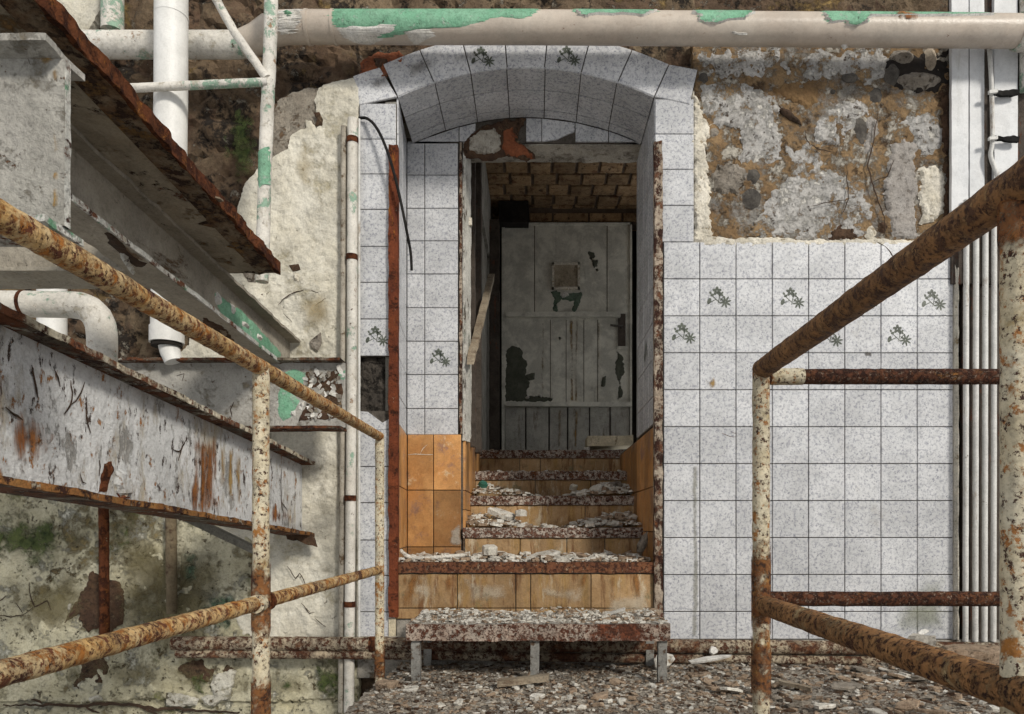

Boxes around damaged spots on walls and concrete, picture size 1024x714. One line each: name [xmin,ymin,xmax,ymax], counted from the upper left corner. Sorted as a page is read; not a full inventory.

rust [0,0,281,275]
flaking render [690,10,949,247]
peeling [551,290,582,312]
flaking render [310,332,322,351]
peeling [276,365,345,421]
peeling [361,358,385,411]
peeling [505,346,552,402]
peeling [601,351,625,398]
rust [15,416,53,459]
rust [0,436,252,526]
rust [270,503,315,537]